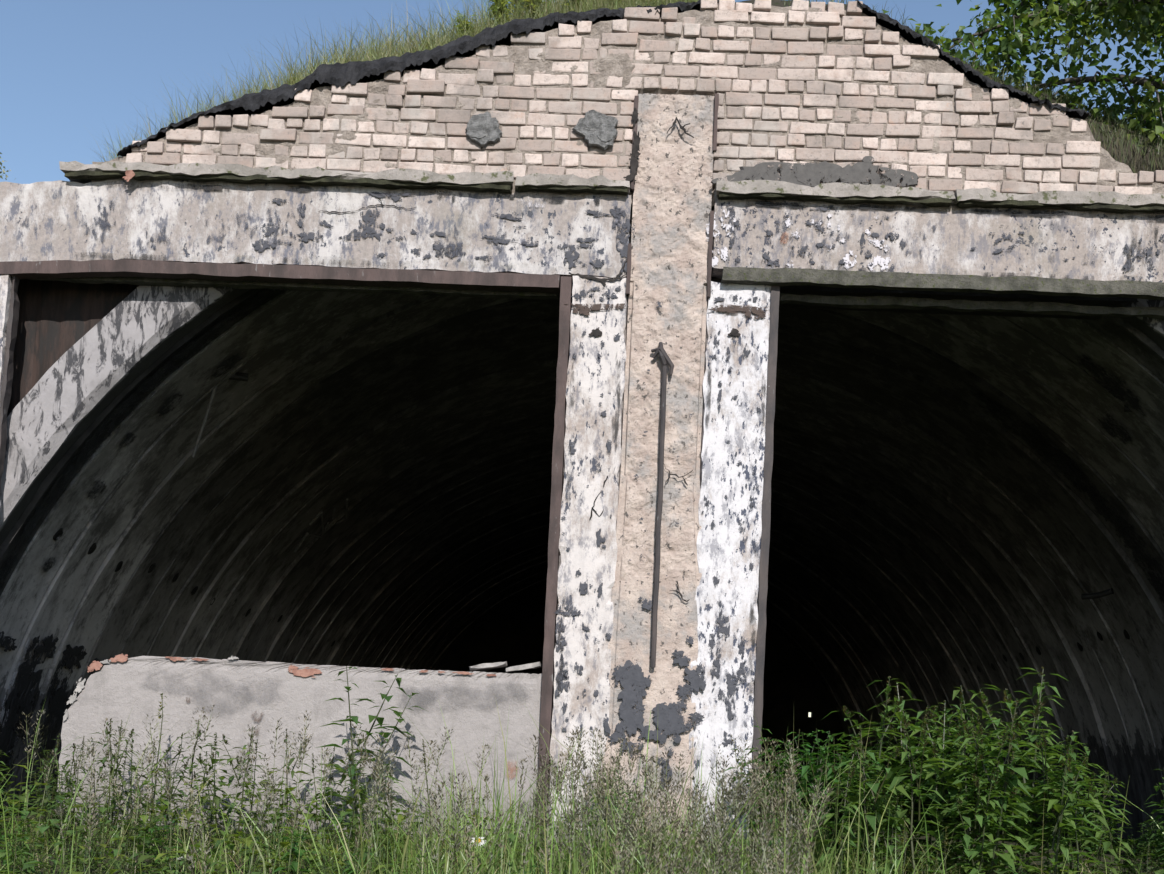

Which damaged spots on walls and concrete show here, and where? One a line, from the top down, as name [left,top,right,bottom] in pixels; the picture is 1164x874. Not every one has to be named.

crack [667,117,694,138]
peeling [252,192,538,261]
peeling [706,201,907,272]
peeling [989,225,1024,254]
peeling [1123,234,1164,280]
peeling [708,295,766,320]
peeling [572,329,621,360]
peeling [709,329,756,420]
peeling [576,388,615,471]